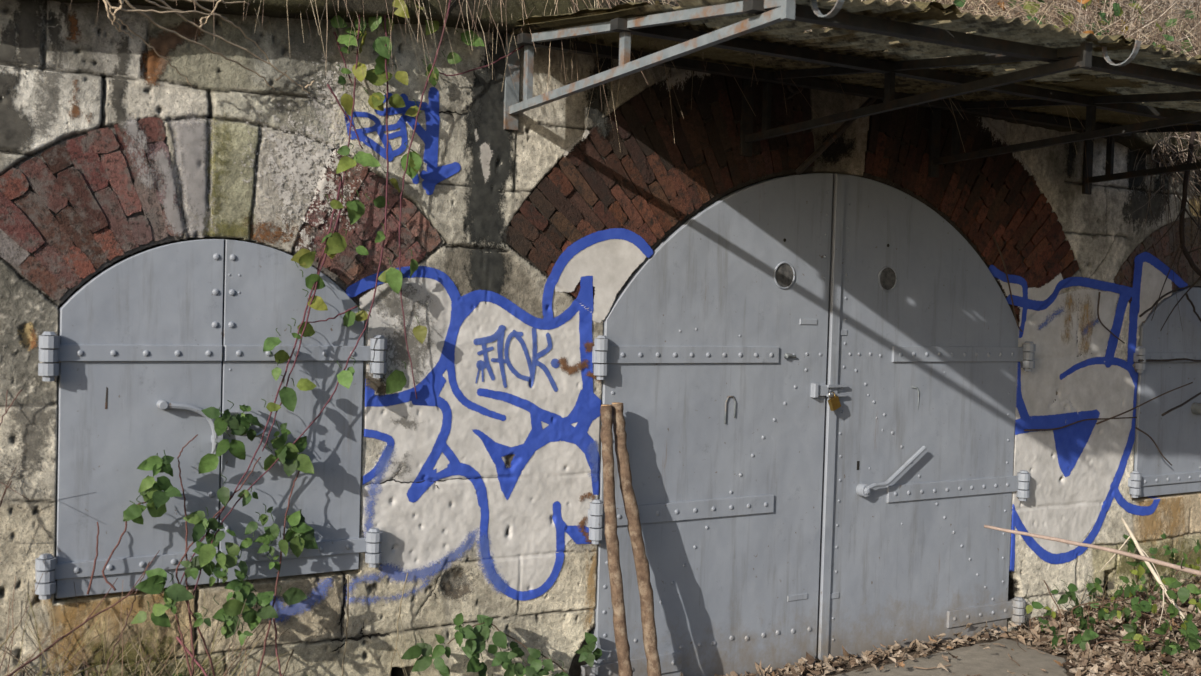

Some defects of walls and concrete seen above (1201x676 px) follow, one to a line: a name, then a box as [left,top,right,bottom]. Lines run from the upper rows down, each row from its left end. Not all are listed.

damp [462,33,517,307]
damp [564,57,613,157]